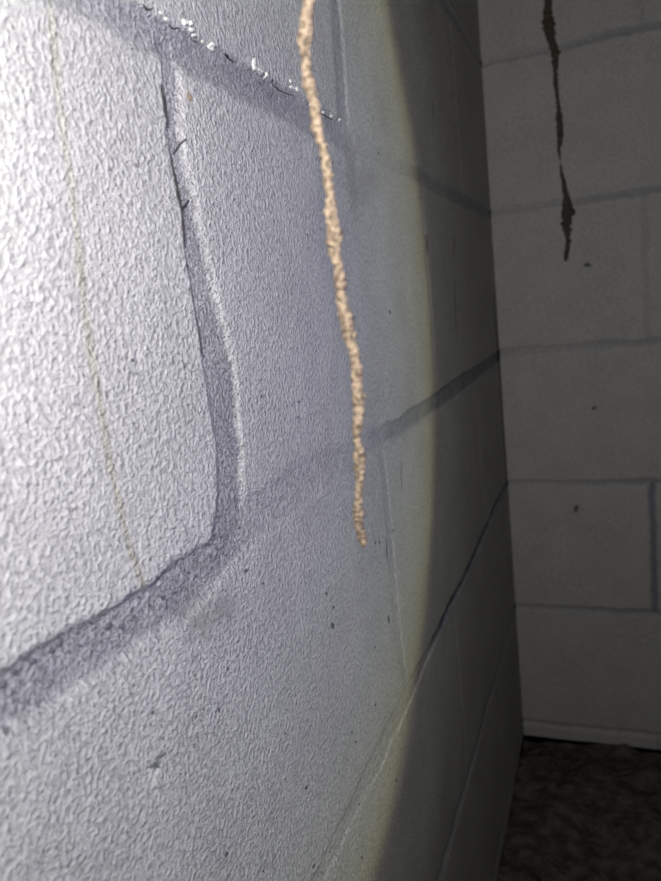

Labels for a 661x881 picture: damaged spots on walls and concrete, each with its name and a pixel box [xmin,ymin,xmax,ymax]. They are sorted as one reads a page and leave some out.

crack [269,79,333,120]